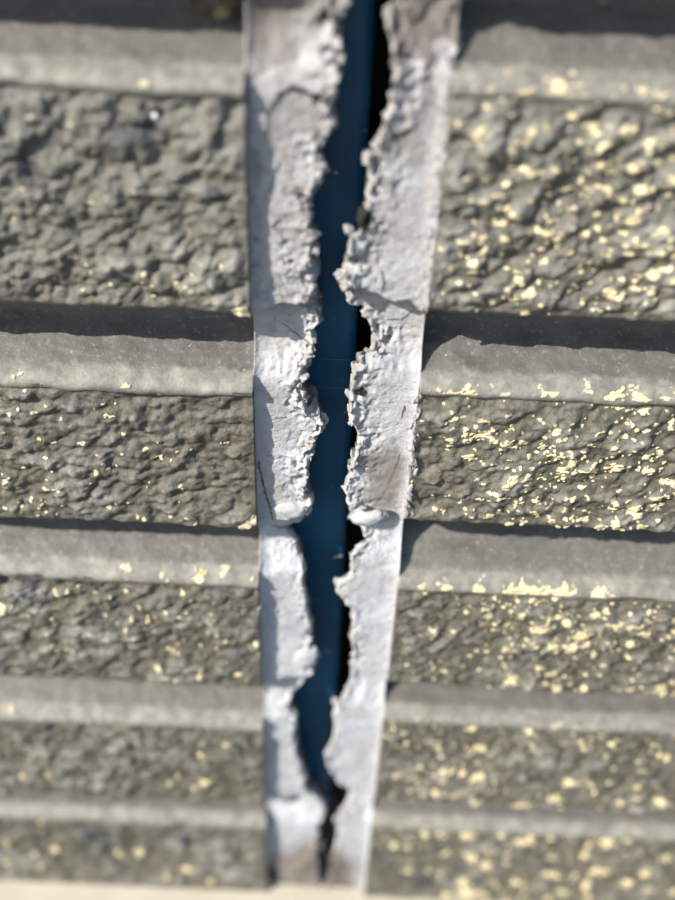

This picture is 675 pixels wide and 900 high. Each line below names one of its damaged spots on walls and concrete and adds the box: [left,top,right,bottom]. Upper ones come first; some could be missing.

crack [326,0,352,59]
crack [278,88,412,485]
crack [257,460,321,670]
crack [333,536,368,585]
crack [378,455,400,502]
crack [290,611,353,882]